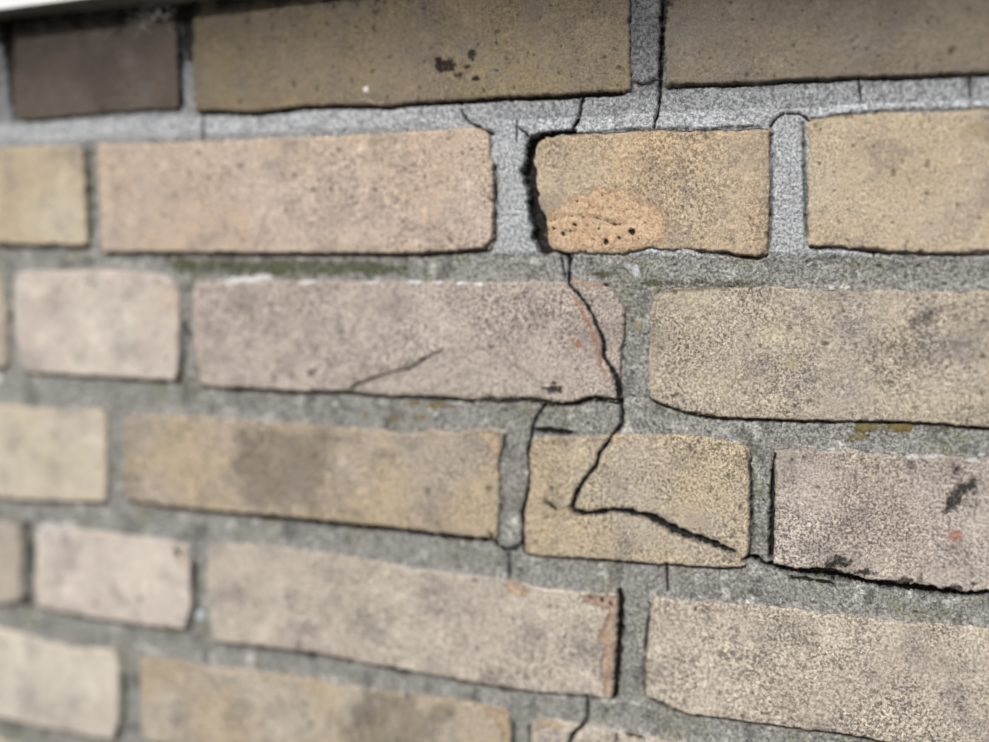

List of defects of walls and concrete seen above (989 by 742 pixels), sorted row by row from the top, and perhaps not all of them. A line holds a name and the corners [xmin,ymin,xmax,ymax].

crack [635,0,667,129]
crack [461,110,532,142]
crack [571,97,585,133]
crack [769,113,810,128]
spalling [546,185,667,253]
crack [350,350,443,391]
crack [482,250,989,596]
crack [568,694,589,742]